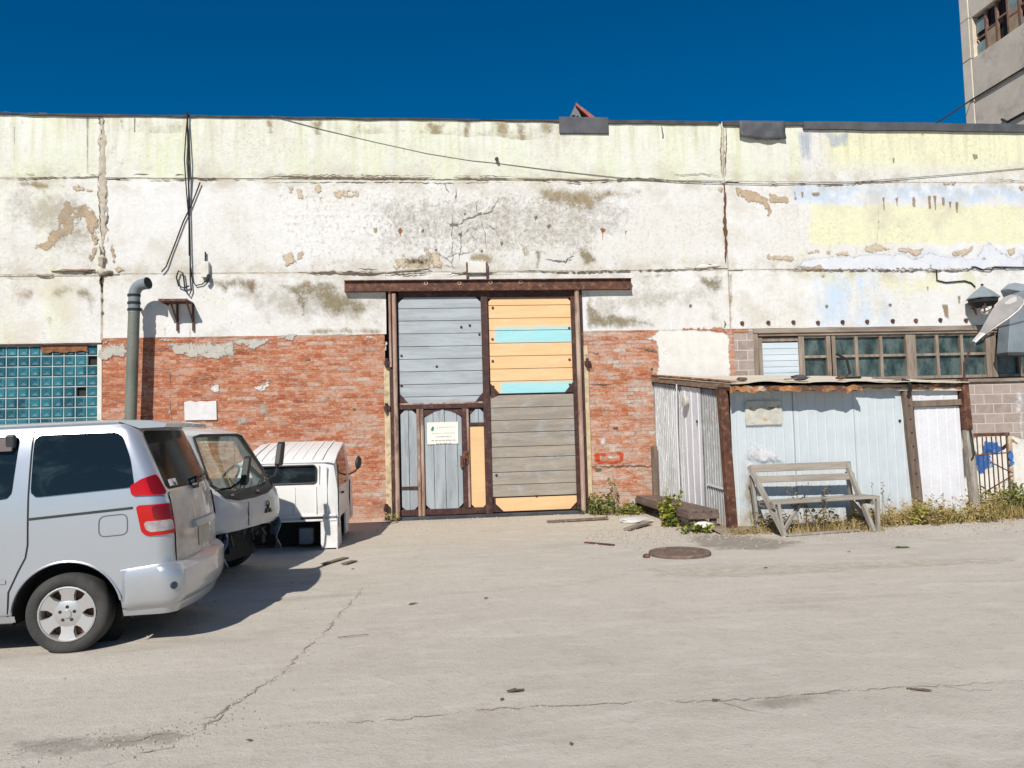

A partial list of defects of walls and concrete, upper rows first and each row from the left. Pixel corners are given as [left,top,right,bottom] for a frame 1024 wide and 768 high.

peeling [736,187,789,216]
peeling [35,185,99,261]
crack [0,116,730,332]
spalling [283,251,304,268]
peeling [393,249,442,269]
peeling [767,242,1024,277]
damp [289,281,364,312]
corrosion [717,383,962,394]